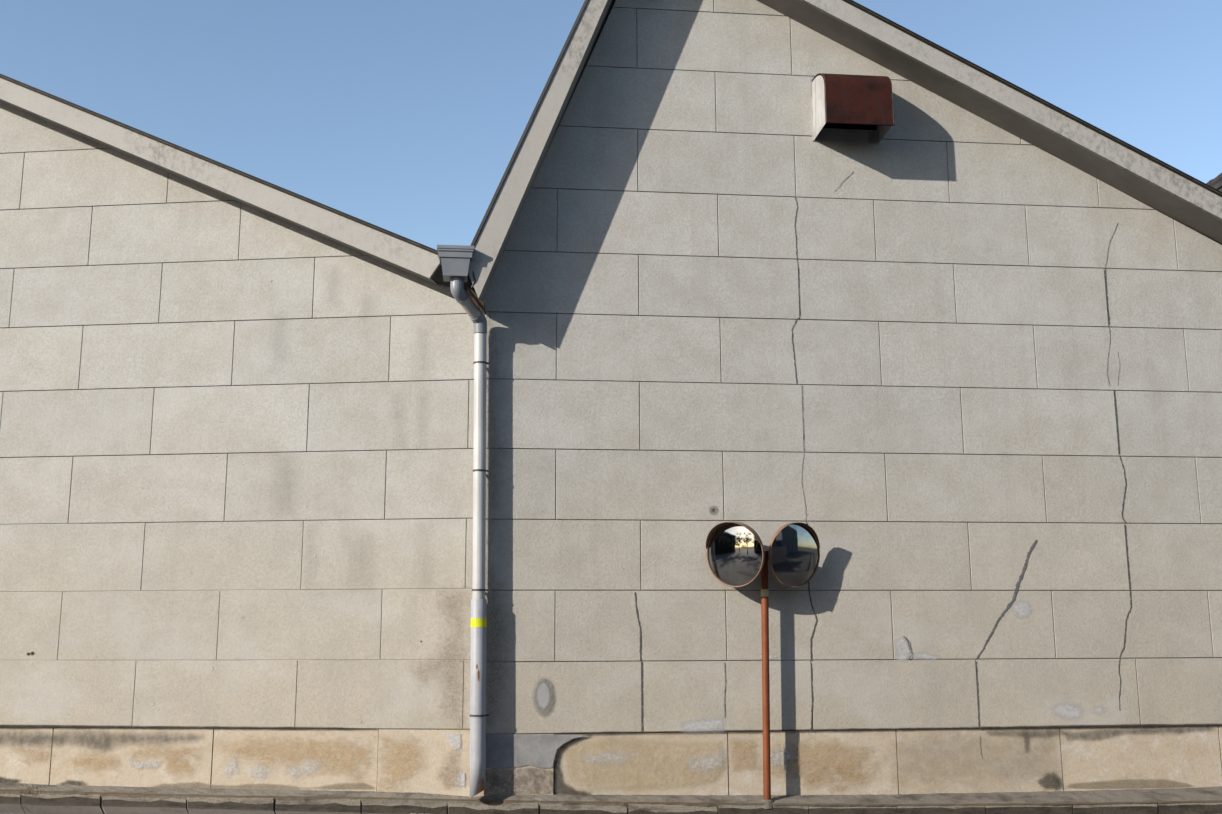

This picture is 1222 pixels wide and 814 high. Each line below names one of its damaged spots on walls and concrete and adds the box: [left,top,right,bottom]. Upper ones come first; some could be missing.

crack [791,197,808,525]
crack [1105,223,1132,711]
crack [808,582,817,731]
crack [975,540,1037,756]
water stain [0,725,355,748]
water stain [156,762,317,789]
water stain [553,732,648,795]
water stain [664,724,1222,751]
water stain [1039,773,1190,789]